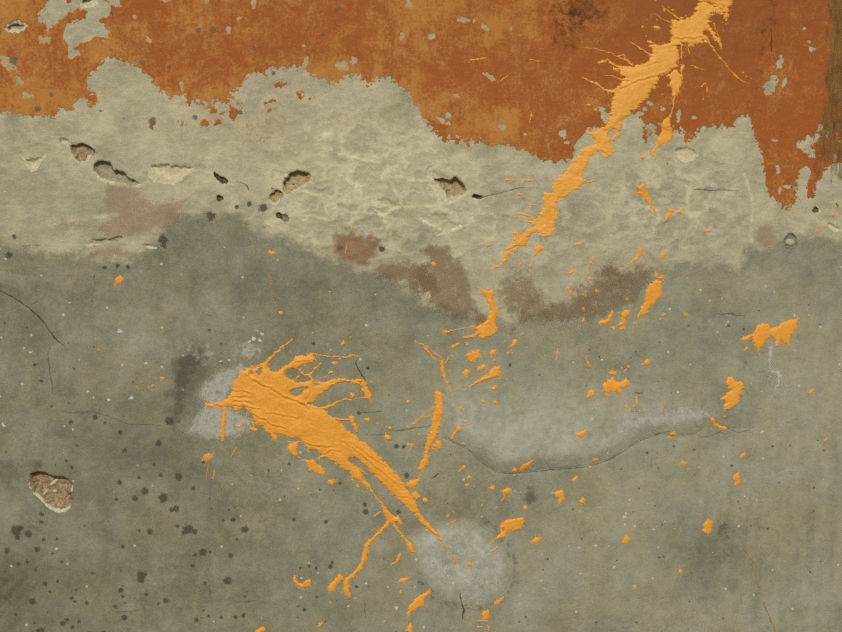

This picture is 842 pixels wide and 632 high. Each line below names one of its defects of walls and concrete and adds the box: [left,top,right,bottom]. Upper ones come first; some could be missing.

peeling [0,44,842,325]
crack [1,291,63,394]
spalling [29,471,73,513]